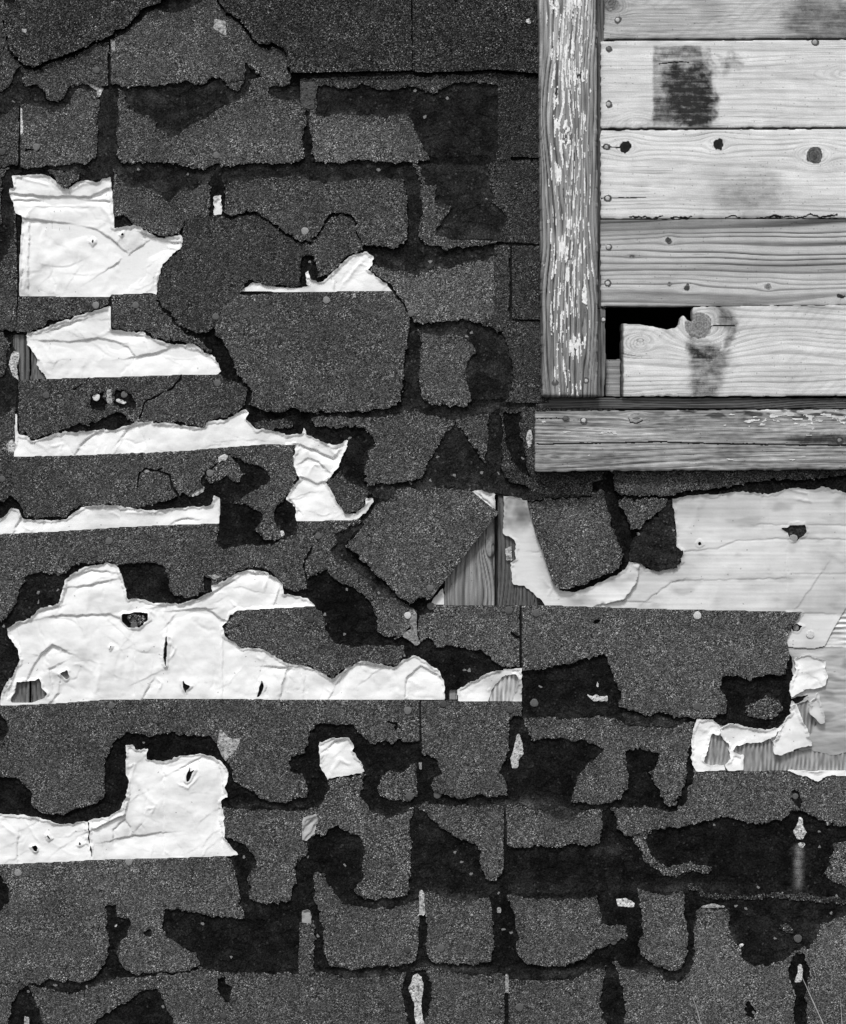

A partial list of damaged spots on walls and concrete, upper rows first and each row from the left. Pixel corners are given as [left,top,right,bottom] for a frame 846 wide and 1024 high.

water stain [654,46,717,127]
peeling [543,0,594,396]
water stain [690,346,725,394]